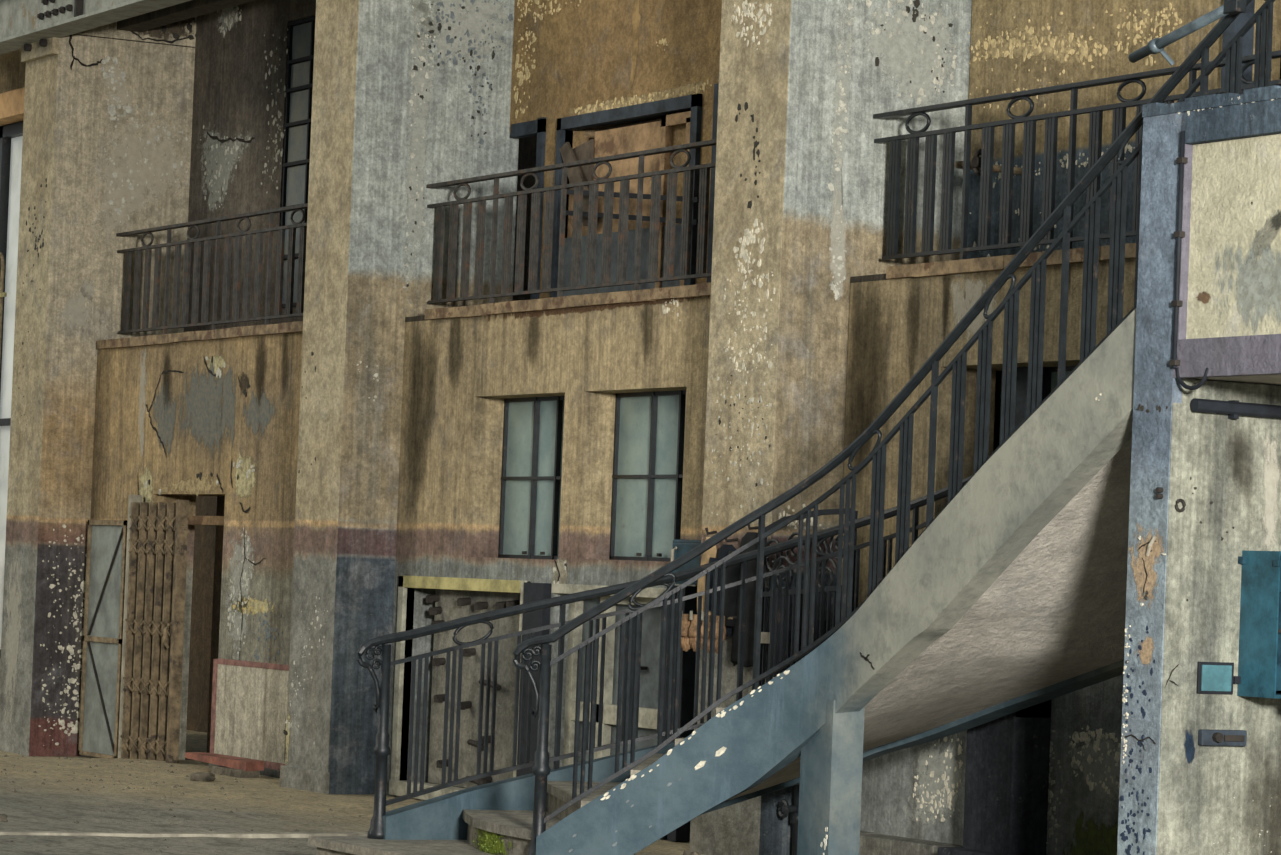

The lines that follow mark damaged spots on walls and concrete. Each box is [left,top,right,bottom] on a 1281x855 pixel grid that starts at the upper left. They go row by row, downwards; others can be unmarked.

peeling [197,125,252,212]
spalling [204,355,226,378]
spalling [238,372,250,397]
leakage [529,319,537,351]
leakage [943,279,996,339]
crack [239,525,265,657]
spalling [1129,524,1166,607]
peeling [38,524,87,746]
peeling [716,670,790,718]
peeling [600,731,696,807]
peeling [694,746,727,770]
peeling [1046,625,1155,855]